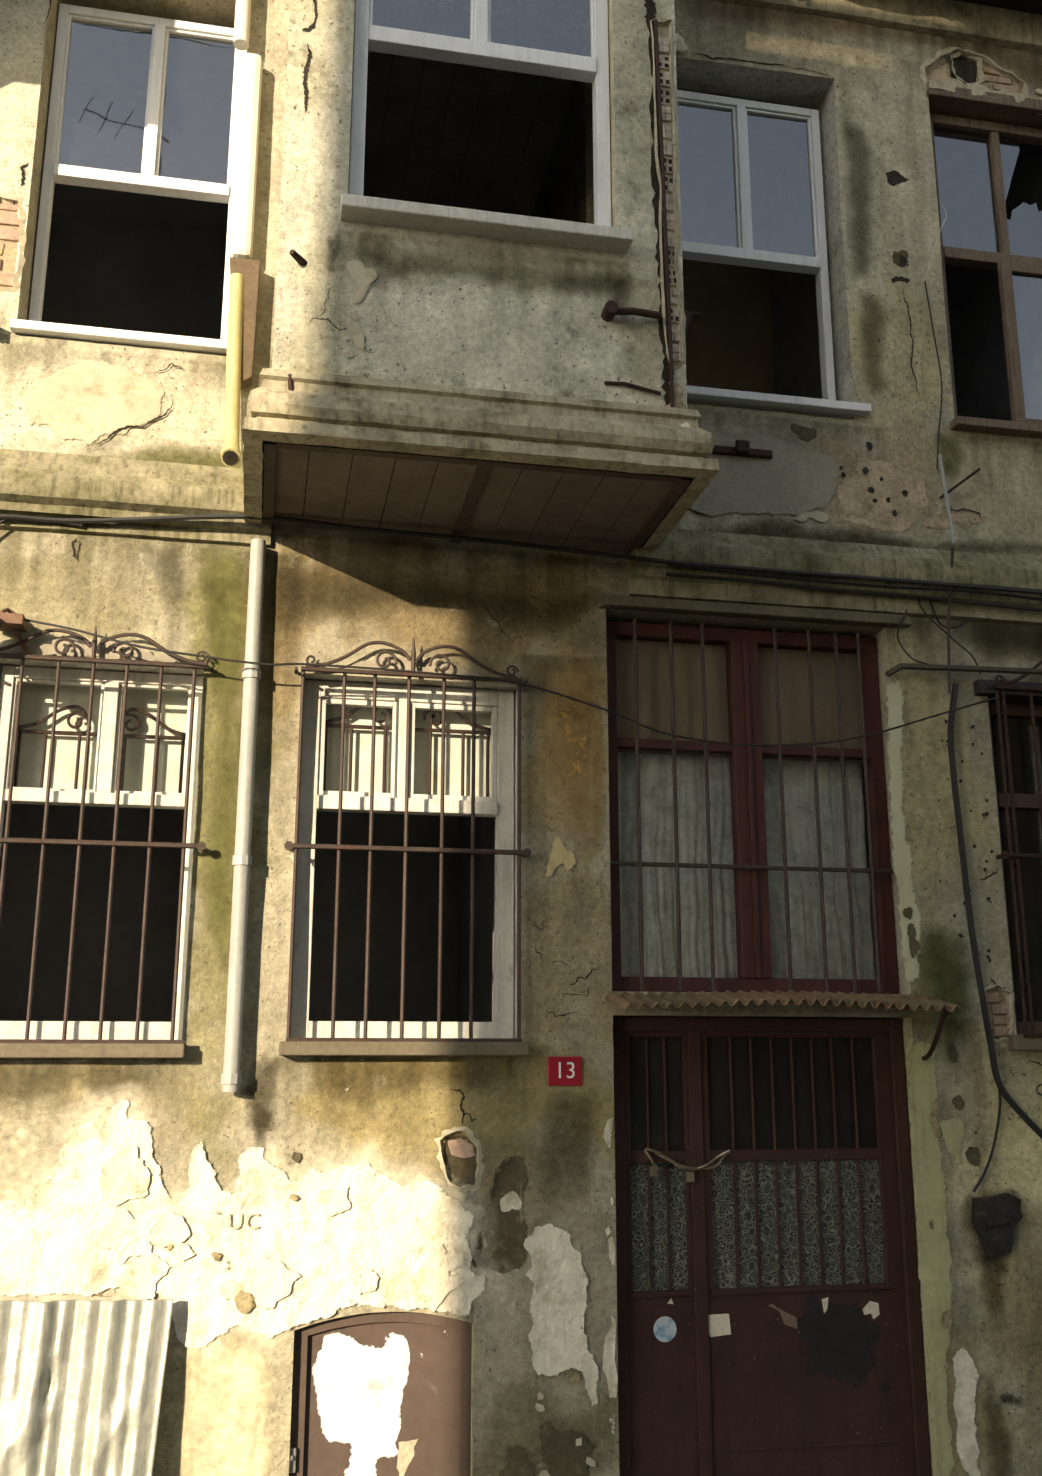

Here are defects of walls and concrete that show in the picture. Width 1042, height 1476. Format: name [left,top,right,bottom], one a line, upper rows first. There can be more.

crack [302,0,318,112]
flaking render [919,47,1042,115]
flaking render [0,192,27,292]
crack [13,163,28,205]
crack [644,0,675,405]
crack [92,363,184,446]
flaking render [791,423,817,441]
flaking render [795,442,982,533]
peeling [886,679,922,982]
damp [247,1065,272,1148]
peeling [0,1096,618,1476]
peeling [908,1041,981,1476]